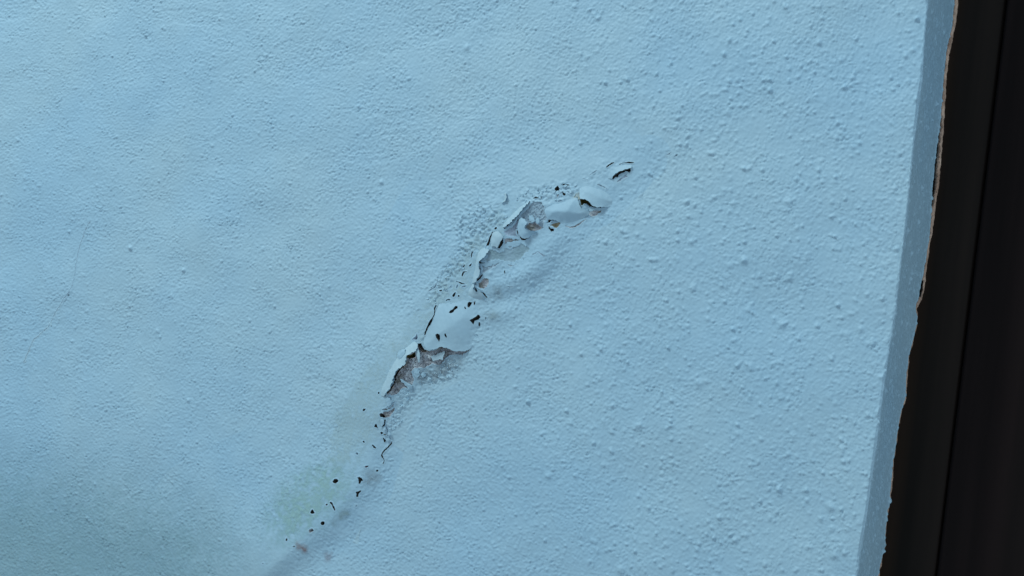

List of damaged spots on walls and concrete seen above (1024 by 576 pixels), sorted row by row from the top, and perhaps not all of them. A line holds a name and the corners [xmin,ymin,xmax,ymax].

peeling [426,161,635,303]
flaking render [374,341,471,430]